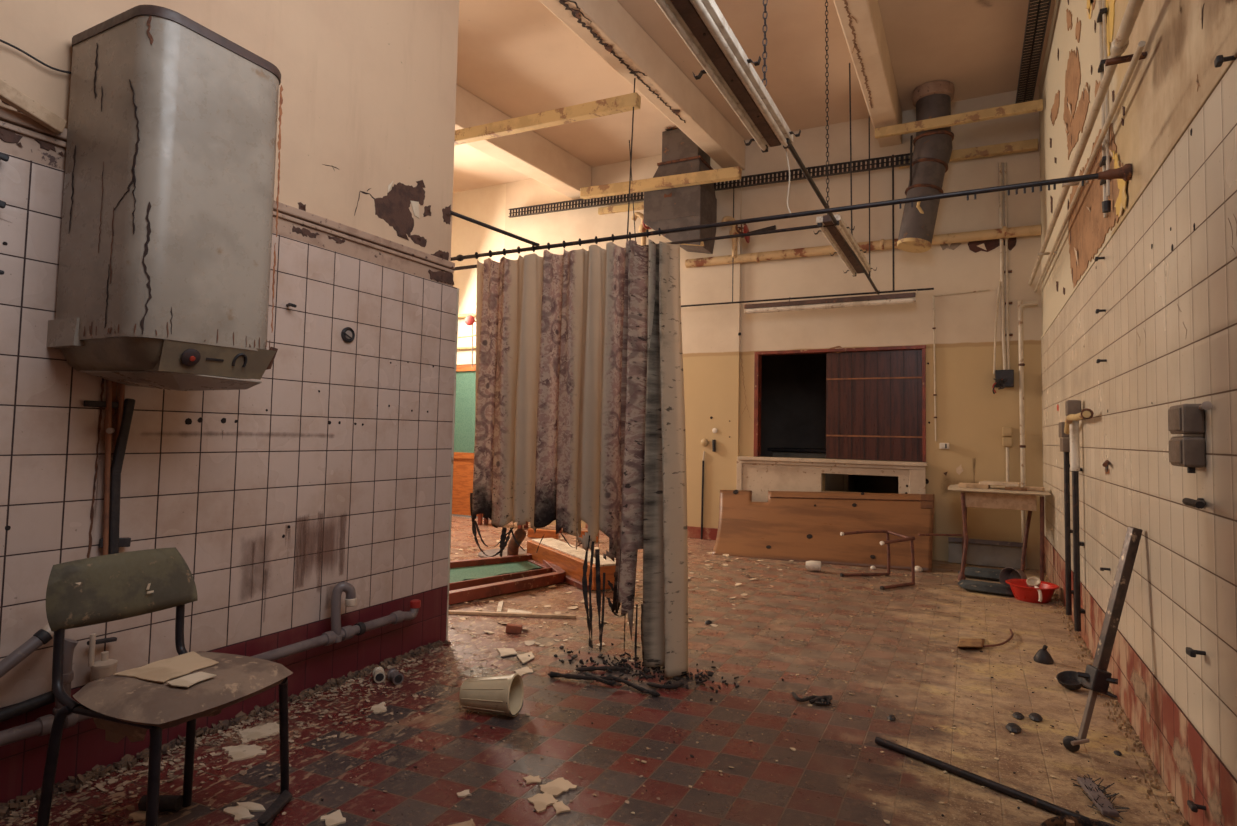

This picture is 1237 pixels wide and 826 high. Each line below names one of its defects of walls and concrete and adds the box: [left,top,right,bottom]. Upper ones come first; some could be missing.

peeling [1049,0,1127,295]
flaking render [374,180,454,285]
peeling [1173,741,1196,799]